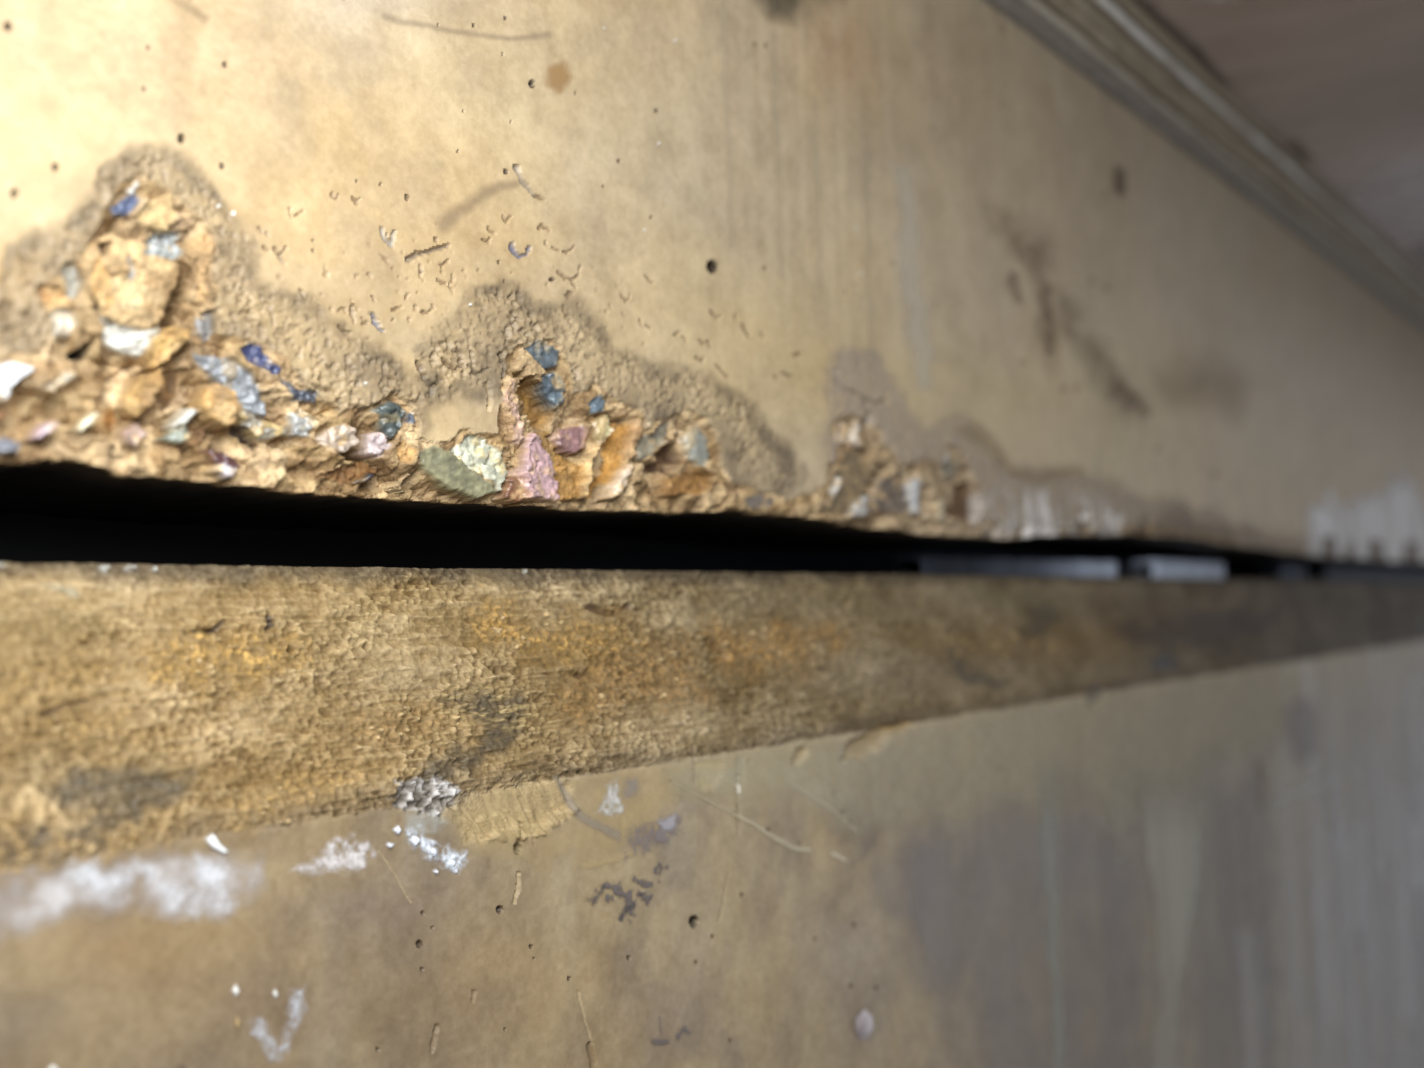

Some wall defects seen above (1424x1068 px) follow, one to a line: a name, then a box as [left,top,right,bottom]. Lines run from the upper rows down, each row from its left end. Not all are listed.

spalling [512,164,546,203]
spalling [0,172,1236,546]
water stain [300,842,369,870]
water stain [388,826,466,873]
water stain [14,866,120,920]
water stain [149,861,252,908]
water stain [1145,806,1200,1068]